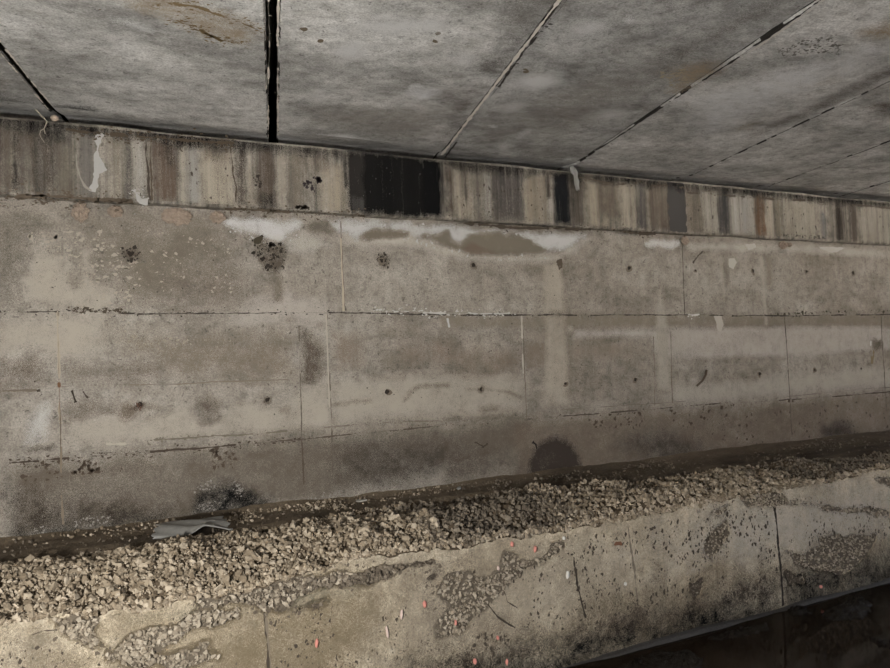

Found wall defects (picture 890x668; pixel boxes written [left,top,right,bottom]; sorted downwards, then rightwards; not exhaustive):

damp [112,0,268,48]
damp [294,0,795,151]
damp [670,39,890,147]
spalling [778,35,843,56]
peeling [20,229,230,311]
hole [251,235,286,271]
damp [0,113,890,500]